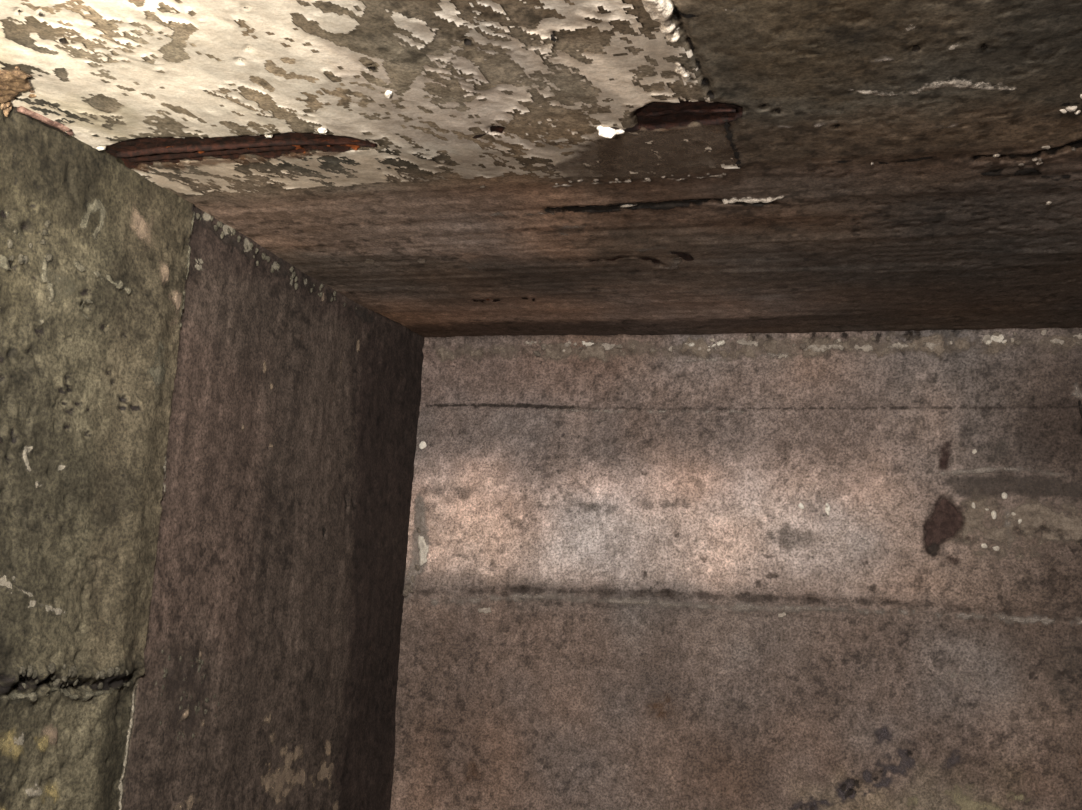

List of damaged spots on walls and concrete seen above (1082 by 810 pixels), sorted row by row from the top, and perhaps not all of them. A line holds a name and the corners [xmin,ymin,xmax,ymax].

crack [672,5,741,168]
rust [611,100,743,133]
rust [105,132,380,171]
peeling [0,0,741,324]
crack [836,156,932,165]
crack [545,196,784,214]
crack [588,249,694,270]
crack [0,663,130,702]